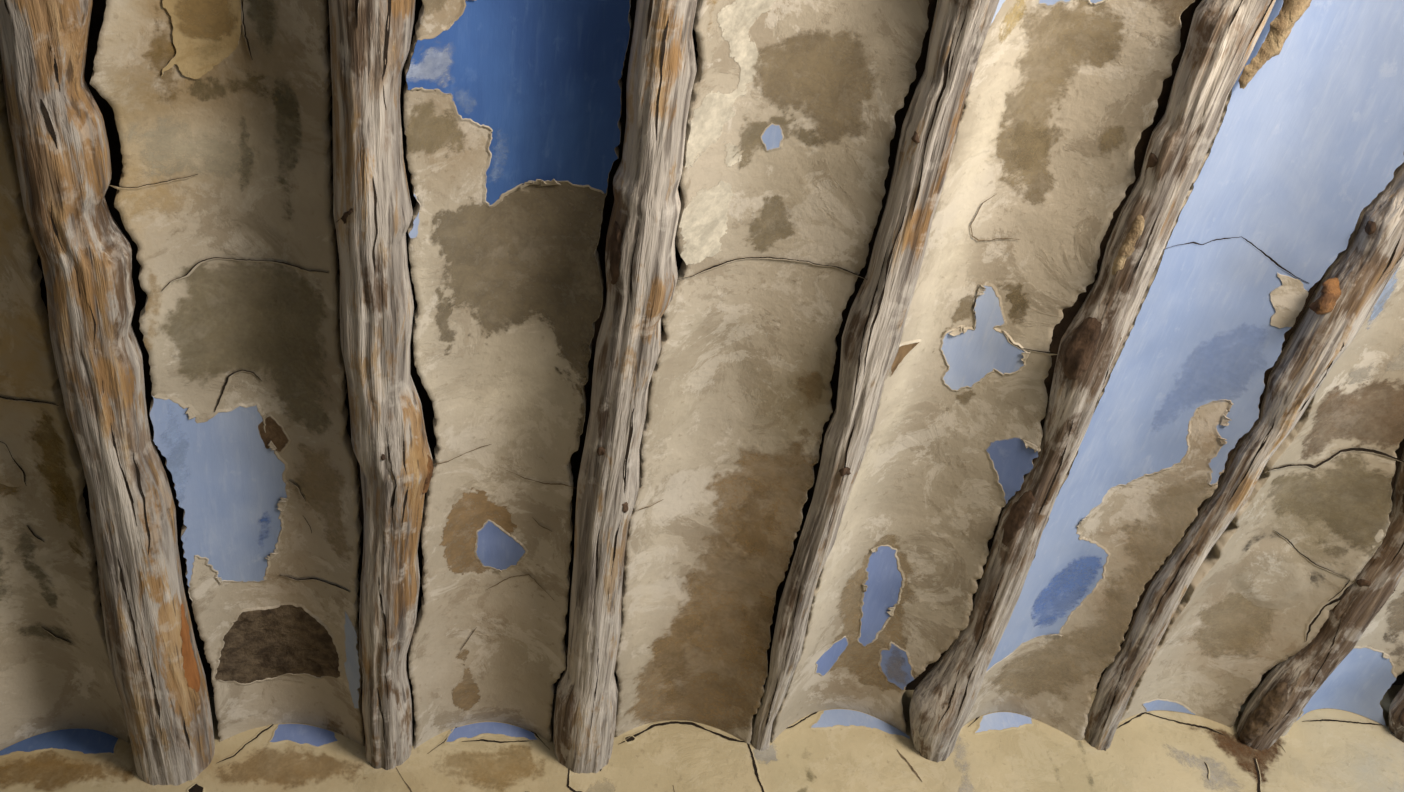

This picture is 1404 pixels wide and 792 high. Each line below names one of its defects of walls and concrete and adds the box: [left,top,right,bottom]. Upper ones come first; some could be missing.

peeling [406,0,630,208]
water stain [679,0,874,265]
water stain [997,0,1126,204]
water stain [432,182,607,439]
peeling [983,0,1404,673]
crack [1163,236,1309,284]
peeling [150,393,360,710]
water stain [626,430,817,731]
crack [427,720,767,792]
crack [1117,712,1226,780]
crack [1254,718,1382,792]
peeling [1295,646,1397,727]